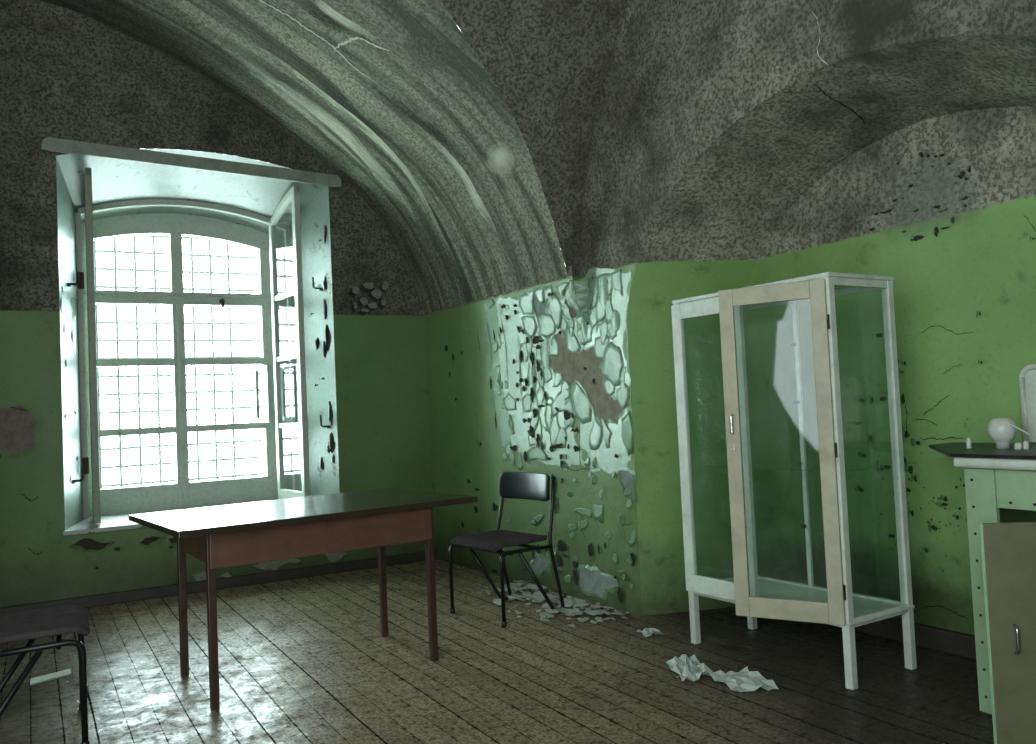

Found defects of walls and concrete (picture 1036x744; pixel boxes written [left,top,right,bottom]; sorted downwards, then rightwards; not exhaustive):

crack [259,0,390,82]
peeling [310,276,331,358]
peeling [319,401,336,470]
peeling [484,267,637,604]